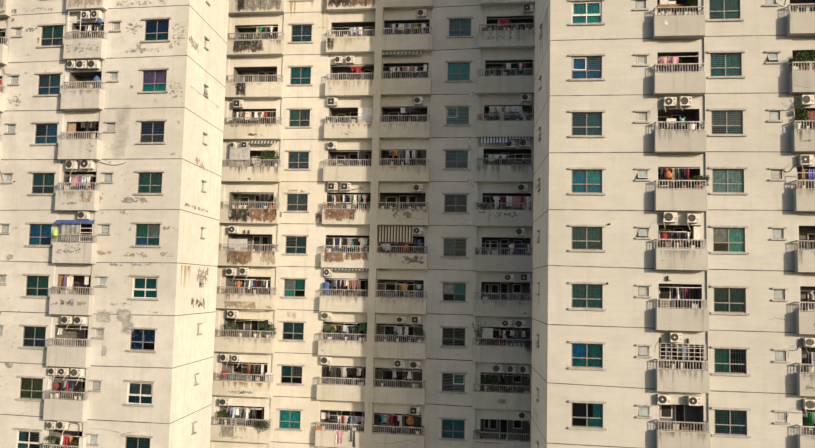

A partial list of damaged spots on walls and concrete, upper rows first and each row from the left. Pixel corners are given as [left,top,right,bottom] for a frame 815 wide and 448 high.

damp [233,40,263,53]
mould [228,209,249,222]